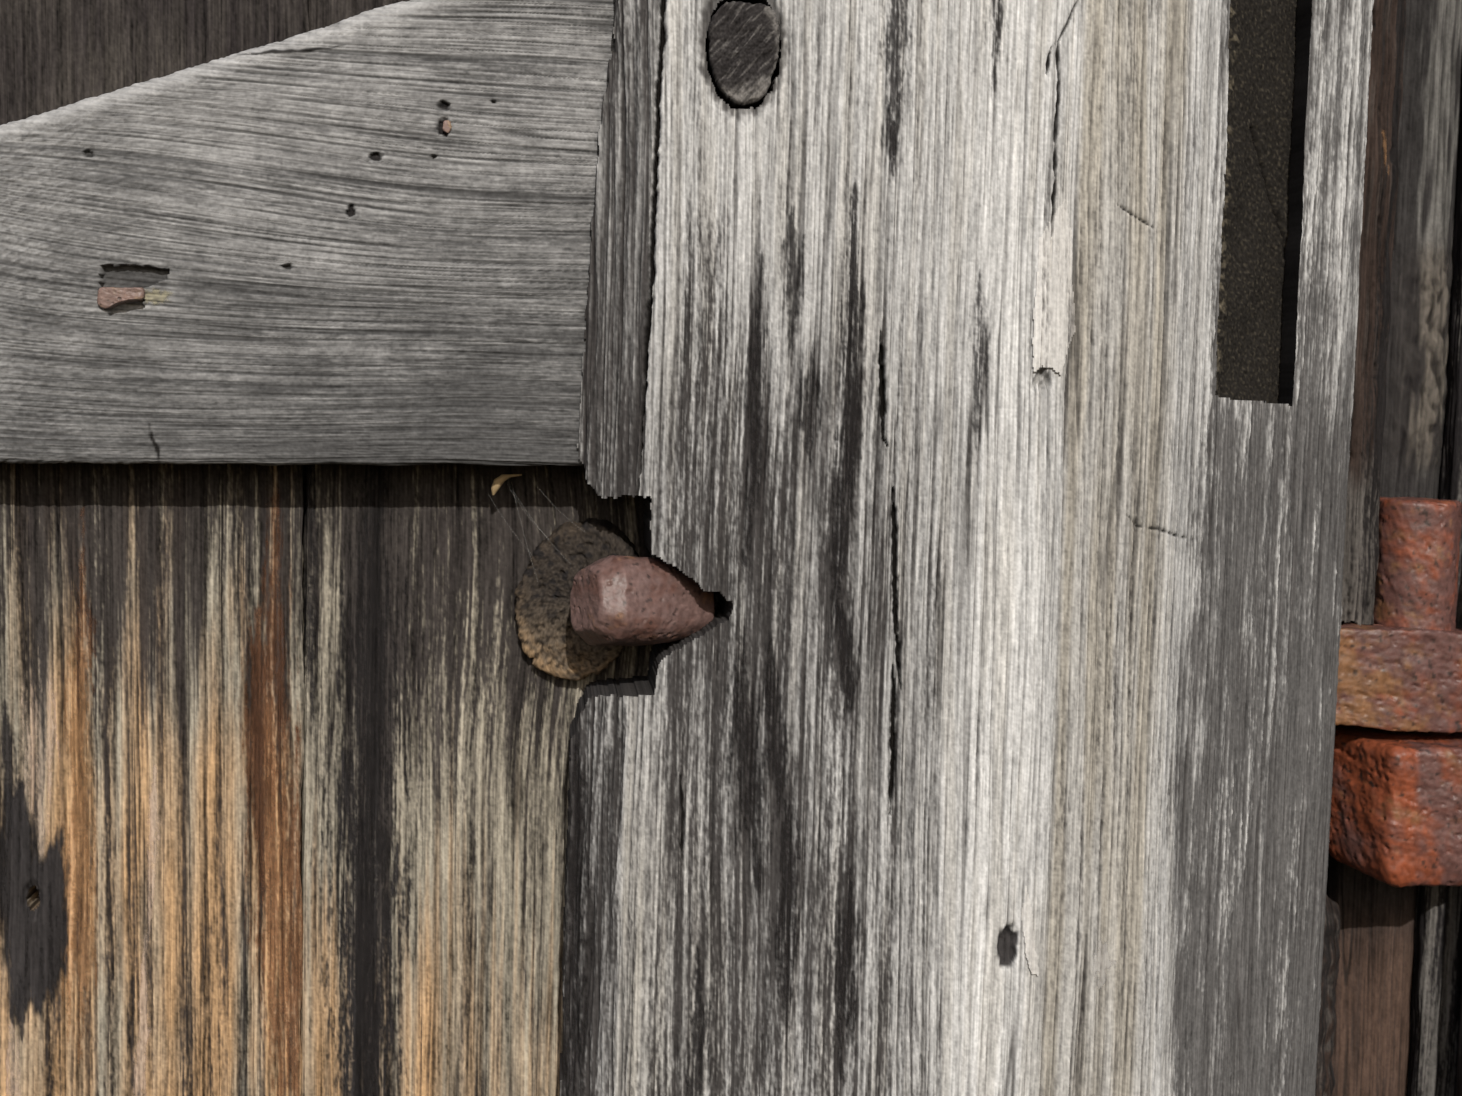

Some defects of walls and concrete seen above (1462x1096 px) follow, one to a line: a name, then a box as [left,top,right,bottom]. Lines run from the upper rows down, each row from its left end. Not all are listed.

crack [1046,10,1072,225]
crack [878,335,887,446]
crack [889,488,901,813]
leakage [0,700,69,1096]
leakage [132,766,160,1096]